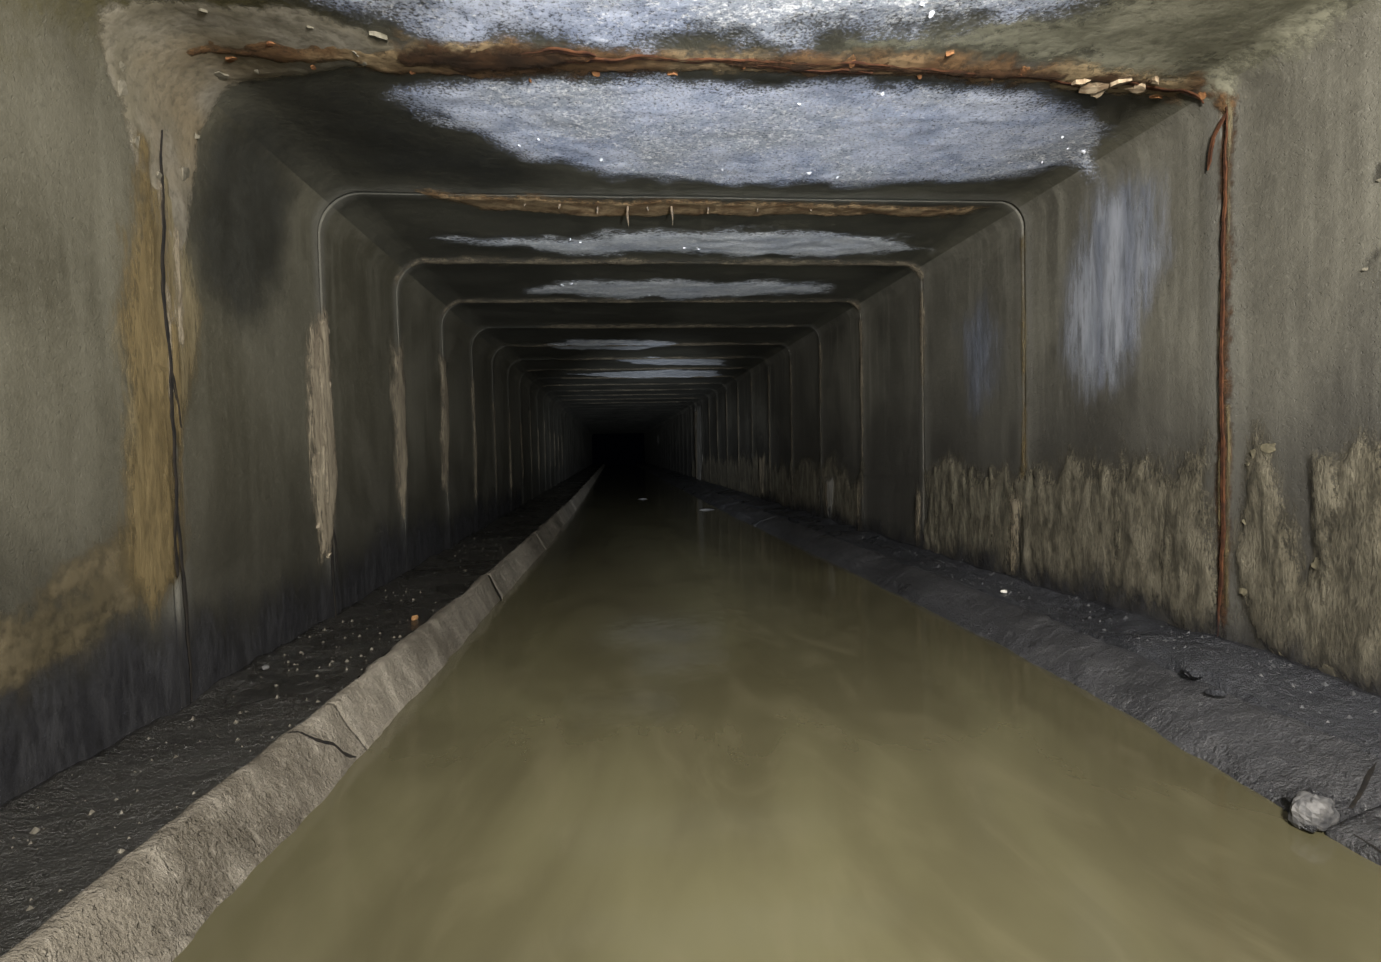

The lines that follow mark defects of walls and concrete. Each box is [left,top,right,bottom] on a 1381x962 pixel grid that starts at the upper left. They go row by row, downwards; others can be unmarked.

water stain [63,0,289,14]
water stain [311,0,1356,100]
water stain [388,72,1106,189]
water stain [394,228,924,316]
rust [186,37,1237,636]
water stain [1065,190,1158,384]
crack [160,130,193,702]
water stain [507,317,1381,698]
crack [288,731,356,758]